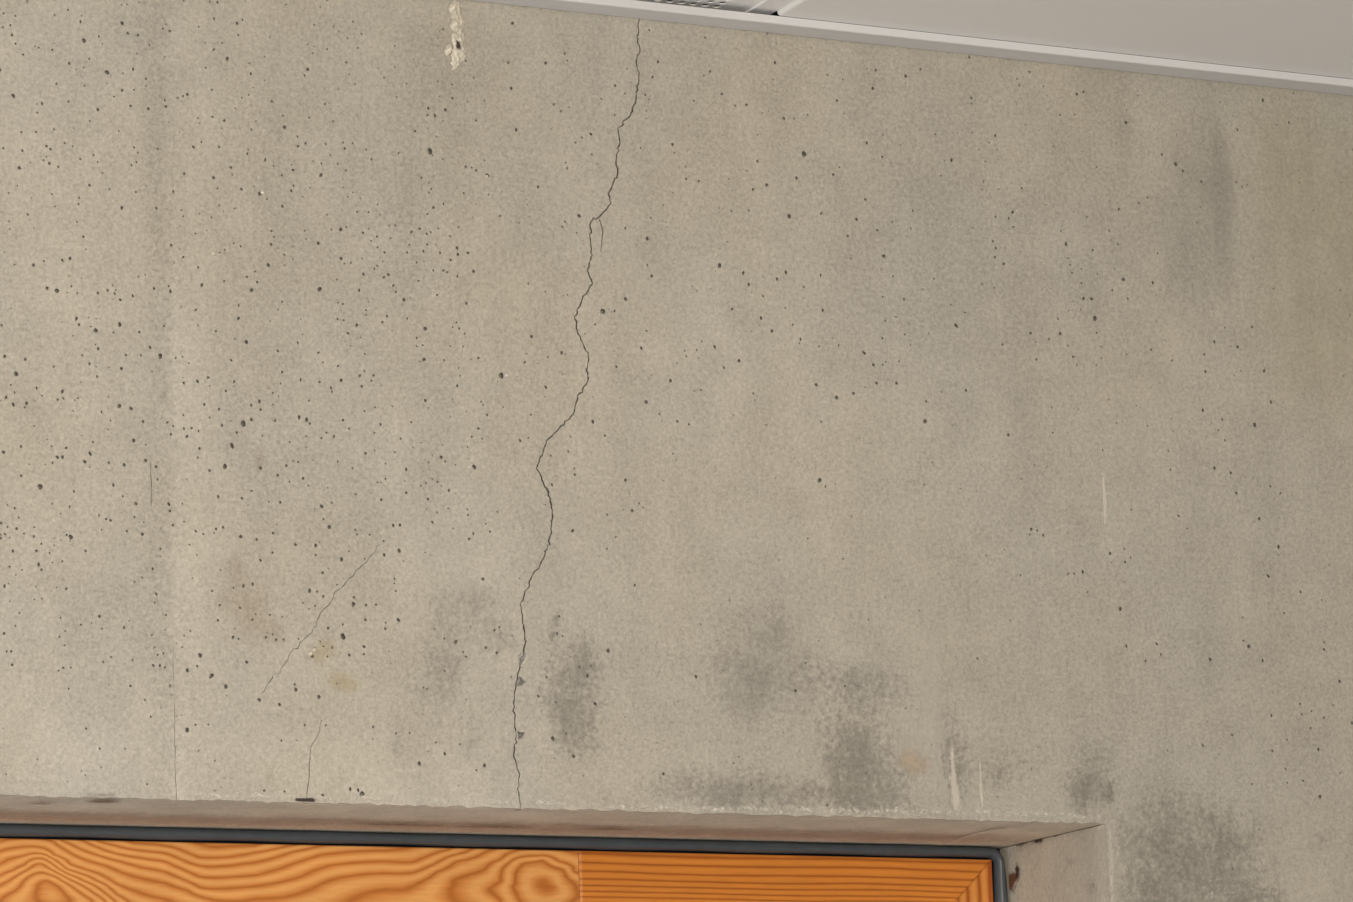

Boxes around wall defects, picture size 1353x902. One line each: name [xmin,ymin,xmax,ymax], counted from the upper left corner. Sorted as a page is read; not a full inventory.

crack [512,19,640,811]
damp [703,752,959,816]